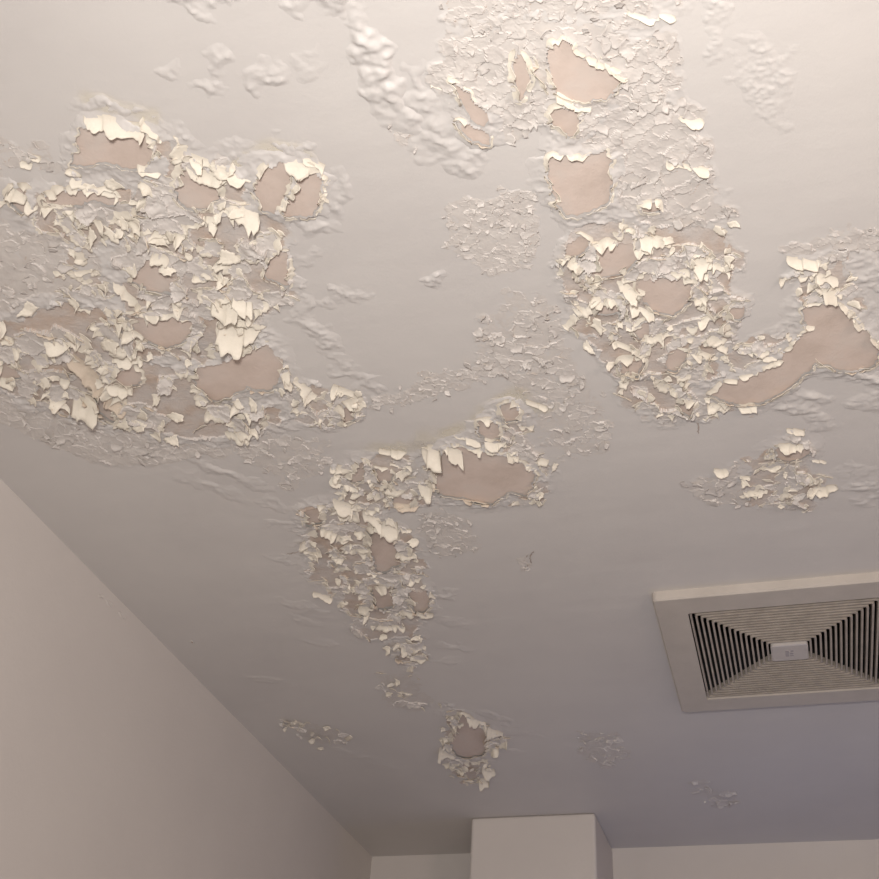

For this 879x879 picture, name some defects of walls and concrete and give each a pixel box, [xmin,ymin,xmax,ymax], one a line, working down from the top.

peeling [0,110,514,792]
peeling [413,0,879,558]